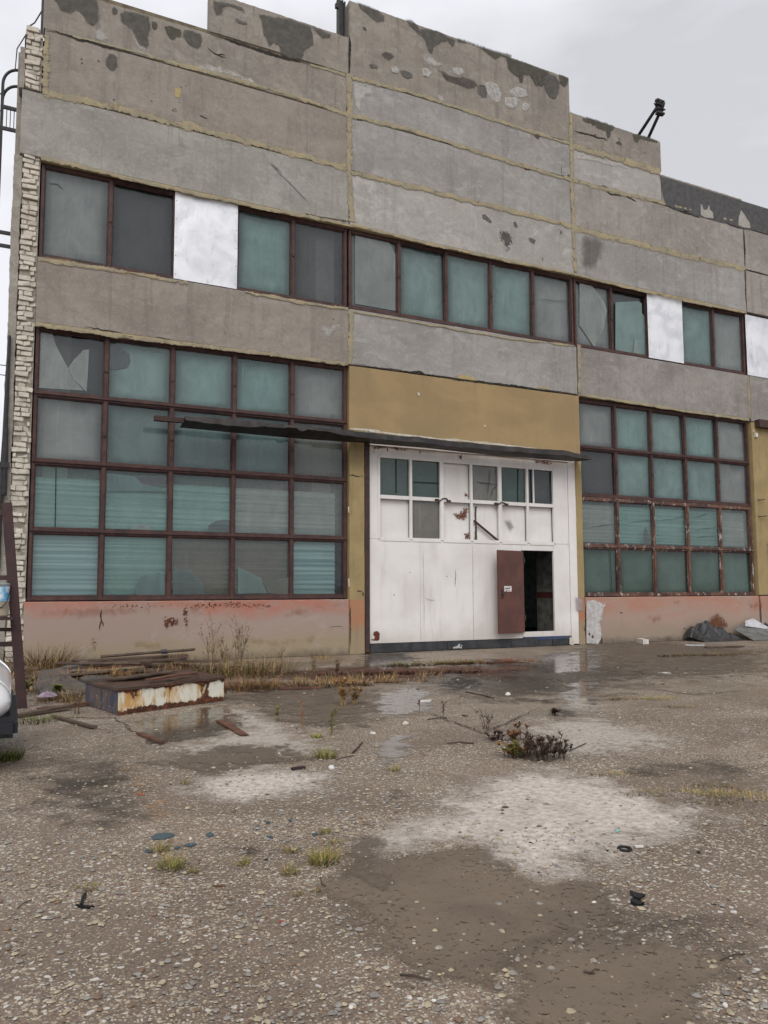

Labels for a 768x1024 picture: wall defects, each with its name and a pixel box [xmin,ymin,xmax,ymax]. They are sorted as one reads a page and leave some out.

peeling [391,66,432,78]
peeling [477,81,529,111]
peeling [701,204,713,218]
peeling [738,211,750,228]
spalling [482,214,536,251]